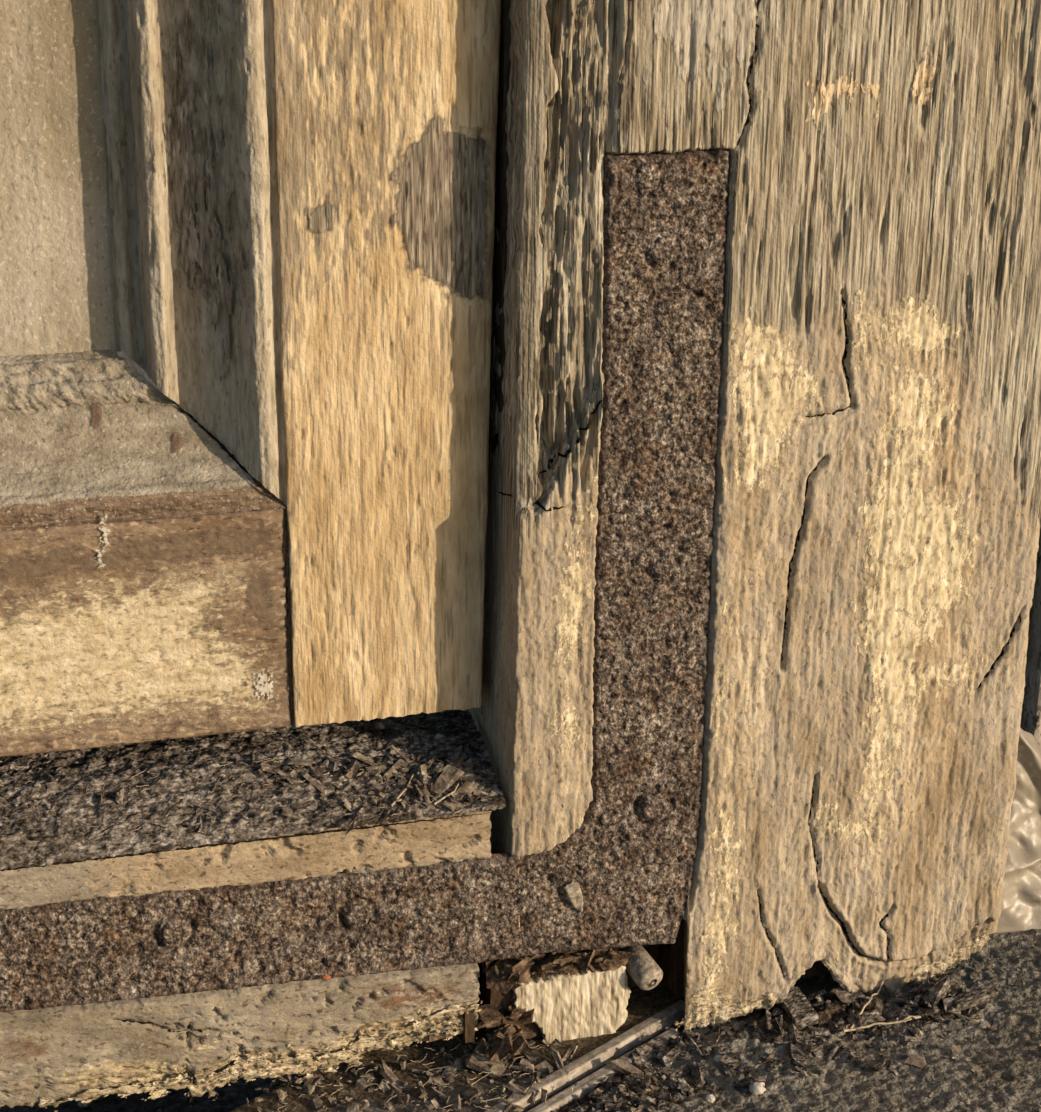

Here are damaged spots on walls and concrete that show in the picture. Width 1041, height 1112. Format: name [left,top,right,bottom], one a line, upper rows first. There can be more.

crack [737,0,760,145]
crack [805,296,852,418]
crack [497,398,604,512]
leakage [0,530,271,582]
leakage [242,572,273,628]
crack [780,457,823,667]
crack [977,610,1022,689]
crack [808,778,903,962]
crack [757,889,785,978]